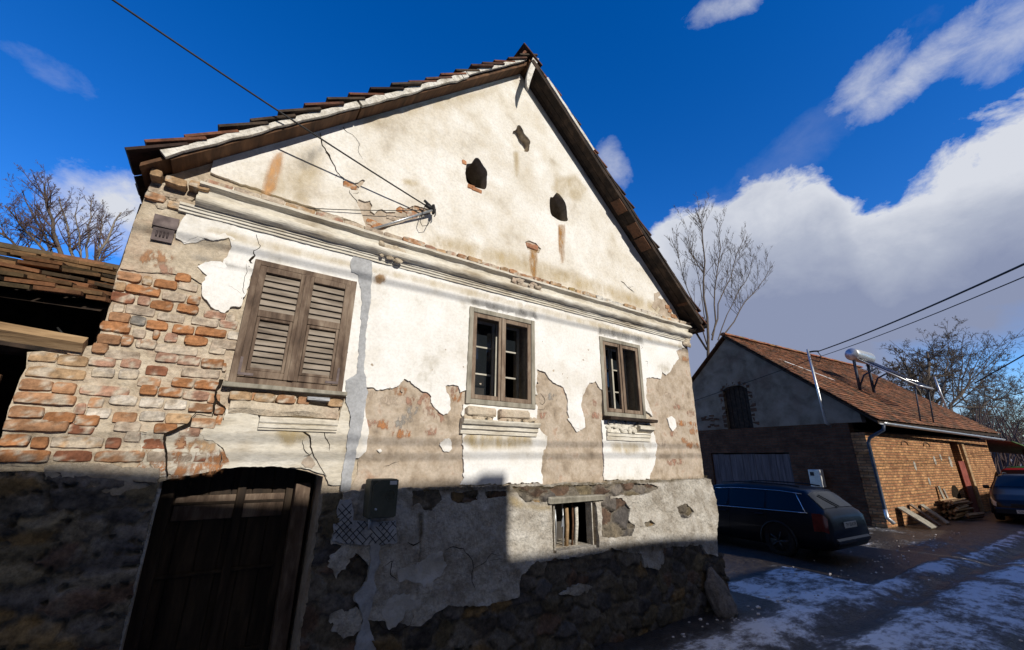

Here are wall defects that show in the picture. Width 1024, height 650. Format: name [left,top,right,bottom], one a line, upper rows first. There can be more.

water stain [265,155,282,195]
crack [320,127,359,203]
flaking render [343,180,432,231]
flaking render [0,198,278,480]
flaking render [651,292,681,321]
crack [143,379,226,477]
crack [300,431,330,475]
spalling [299,340,760,650]